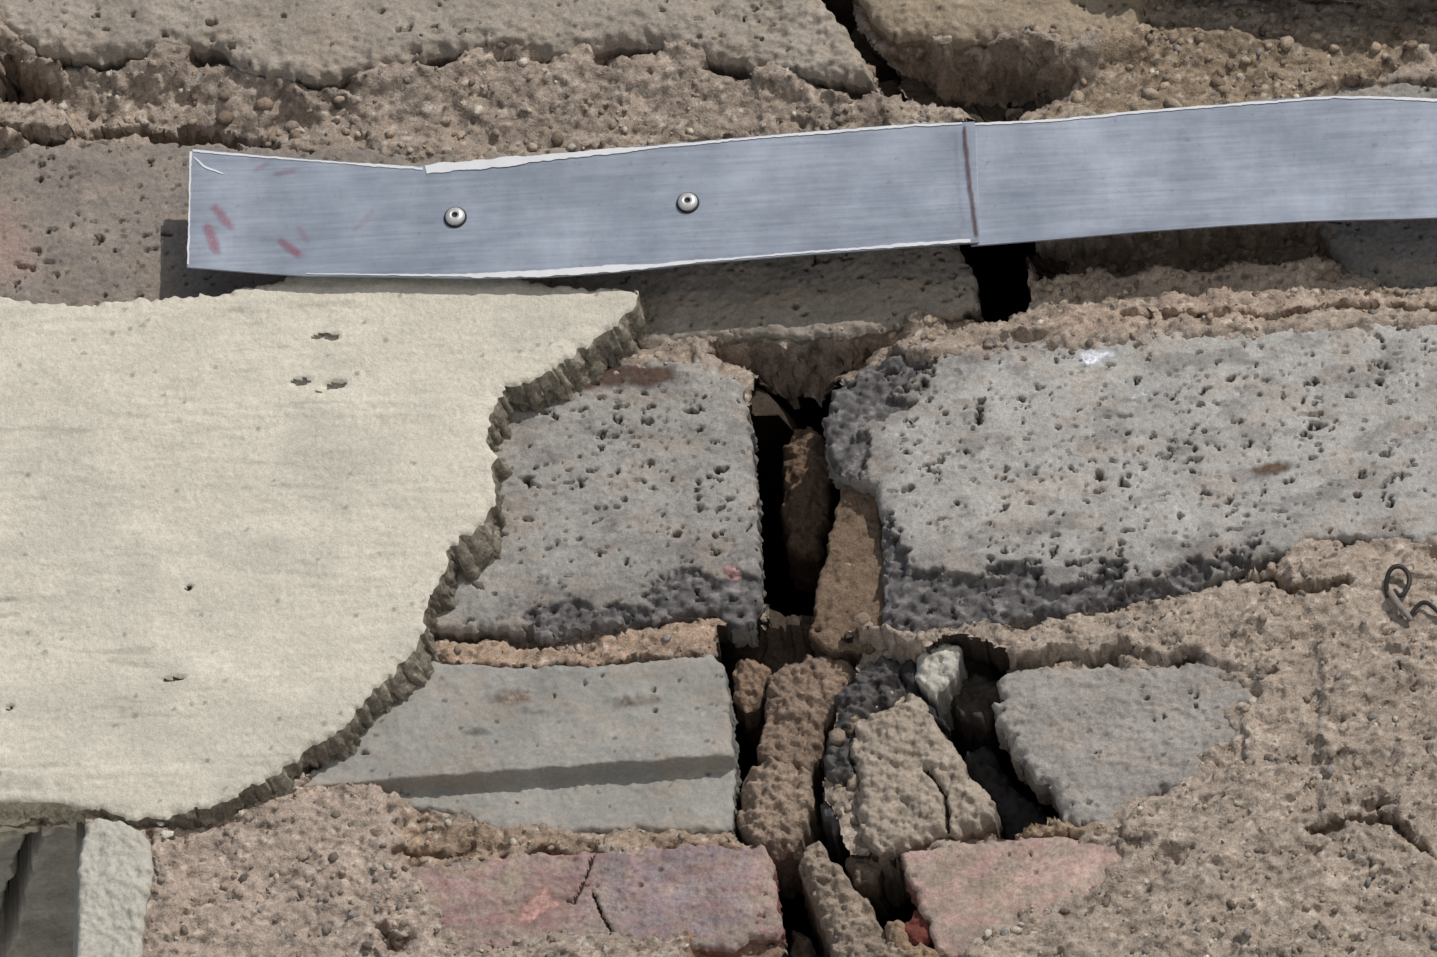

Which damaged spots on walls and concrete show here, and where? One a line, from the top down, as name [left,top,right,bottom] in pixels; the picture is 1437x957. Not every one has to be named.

crack [821,0,1038,123]
crack [960,242,1069,323]
spalling [808,353,1260,671]
spalling [0,294,652,840]
spalling [523,568,764,641]
crack [715,370,858,847]
crack [923,633,1010,680]
crack [924,738,1059,841]
crack [572,856,612,932]
crack [773,892,823,957]
crack [822,786,918,932]
spalling [905,909,933,948]